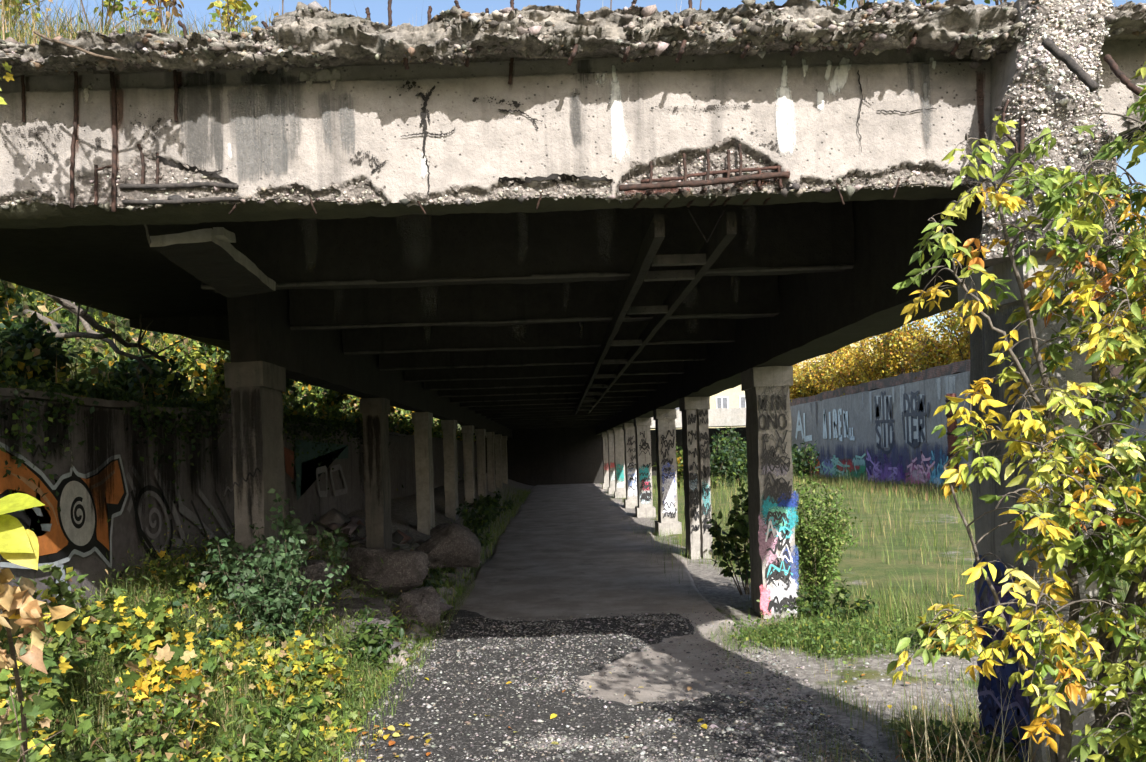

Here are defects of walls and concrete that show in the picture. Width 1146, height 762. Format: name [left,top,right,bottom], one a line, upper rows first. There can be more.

corrosion [110,74,123,180]
water stain [178,68,355,181]
crack [401,85,455,195]
spalling [0,0,1029,215]
water stain [570,60,627,159]
efflorescence [776,60,795,153]
efflorescence [817,57,851,109]
crack [857,70,937,152]
spalling [1041,38,1099,92]
spalling [1092,1,1146,40]